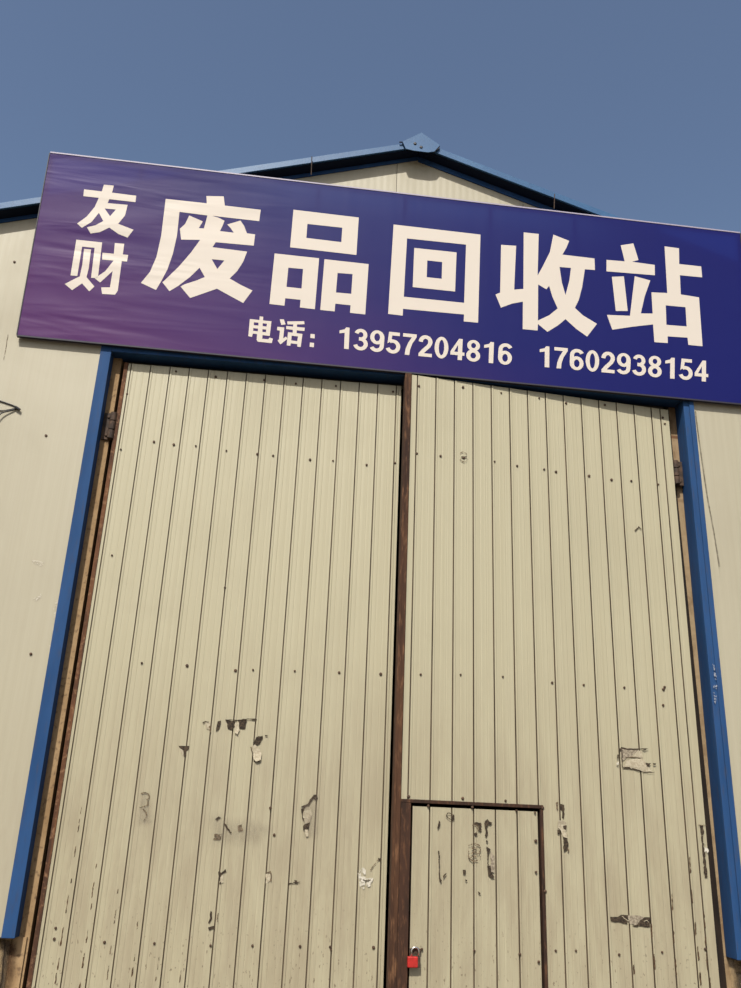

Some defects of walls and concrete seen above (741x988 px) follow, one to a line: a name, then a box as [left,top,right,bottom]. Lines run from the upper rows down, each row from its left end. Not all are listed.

peeling [216,719,257,734]
peeling [252,735,268,762]
peeling [617,748,656,772]
peeling [474,819,495,878]
peeling [610,915,653,939]